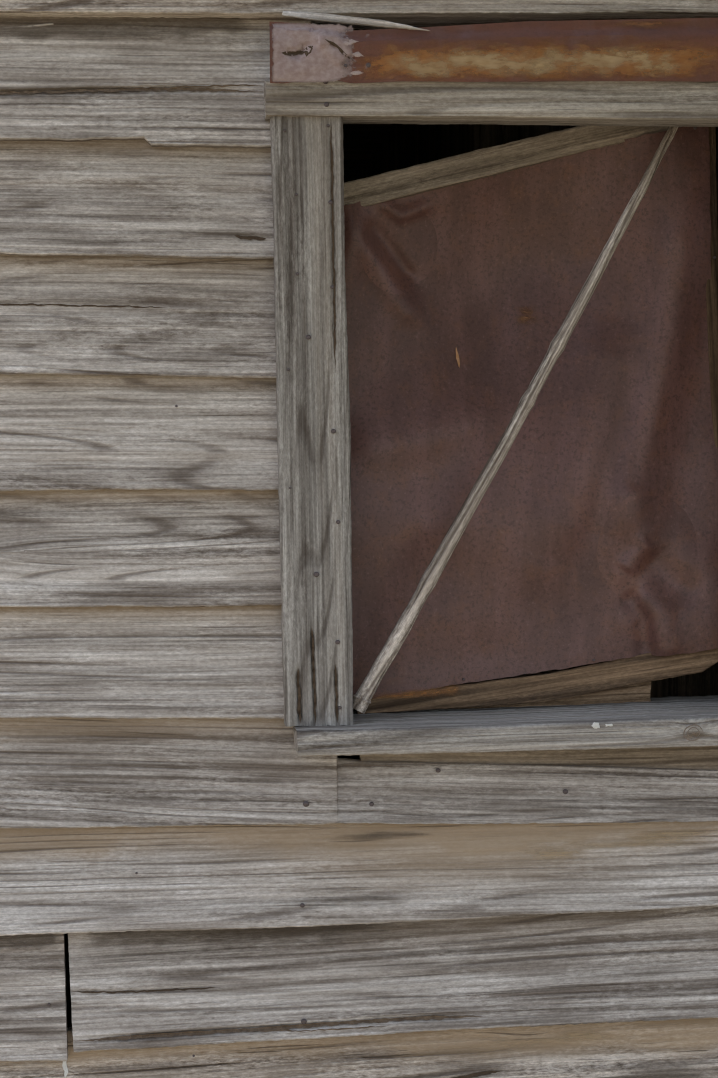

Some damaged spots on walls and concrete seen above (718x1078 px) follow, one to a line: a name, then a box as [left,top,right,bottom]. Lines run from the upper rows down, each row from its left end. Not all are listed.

peeling [272,24,363,82]
corrosion [368,46,718,77]